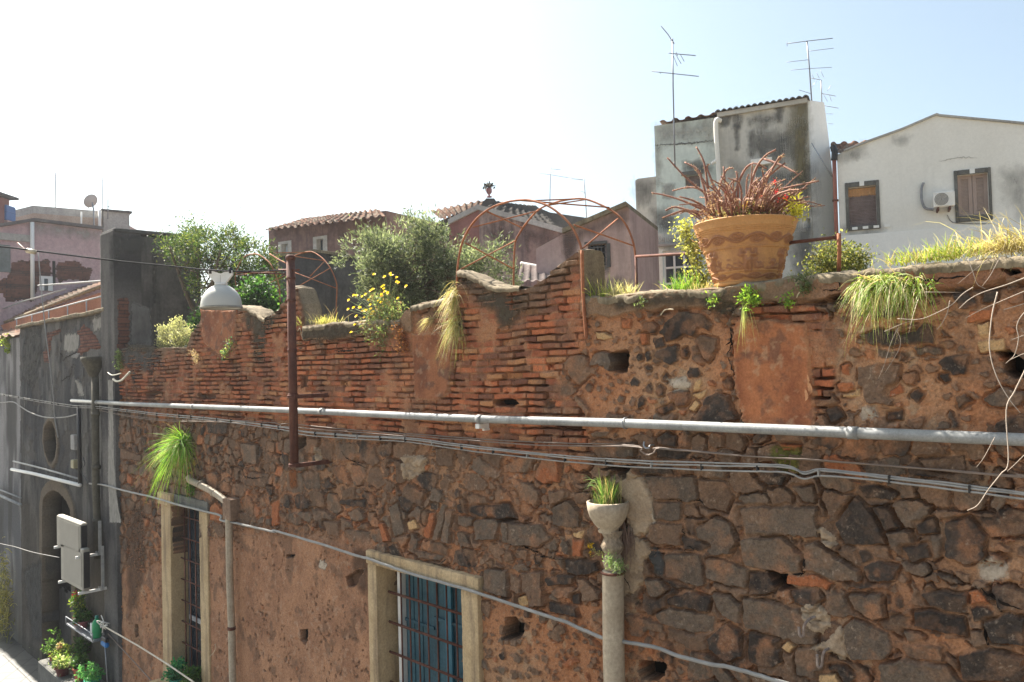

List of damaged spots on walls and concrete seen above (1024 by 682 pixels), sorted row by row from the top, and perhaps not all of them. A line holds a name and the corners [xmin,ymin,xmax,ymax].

damp [721,102,809,209]
spalling [0,259,93,302]
spalling [43,316,101,363]
spalling [117,297,131,350]
crack [726,328,735,375]